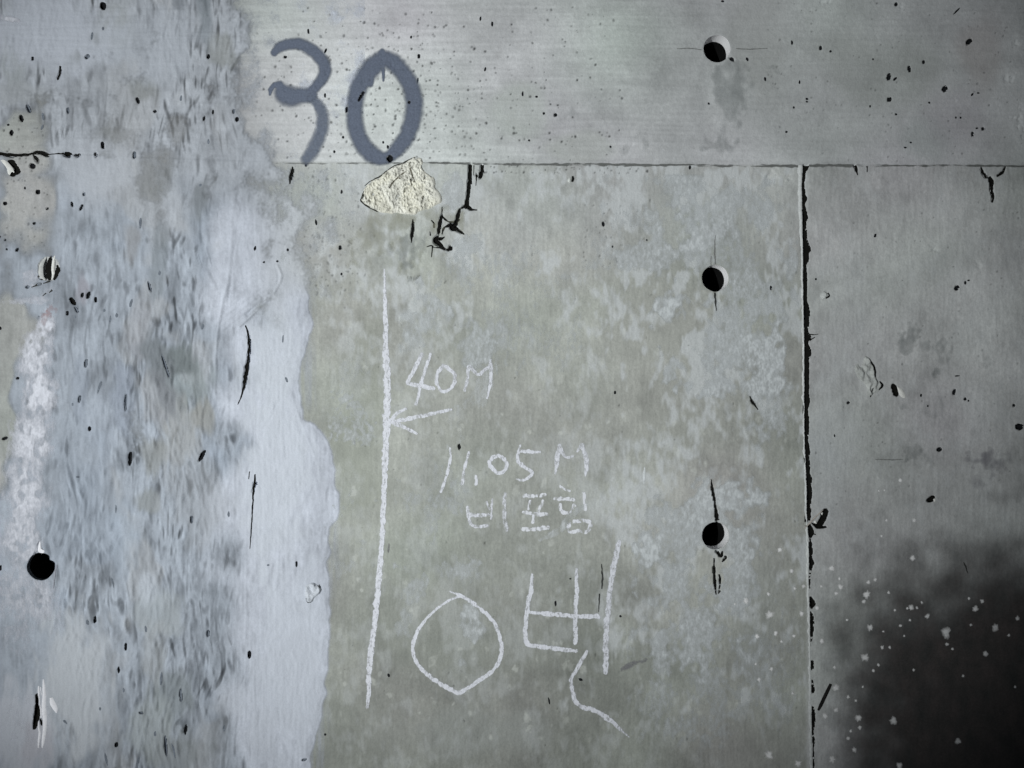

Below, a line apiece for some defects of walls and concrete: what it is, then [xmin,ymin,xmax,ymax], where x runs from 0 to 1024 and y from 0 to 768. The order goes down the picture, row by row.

damp [0,316,57,618]
crack [237,325,250,405]
crack [348,157,1024,768]
damp [851,553,1024,768]